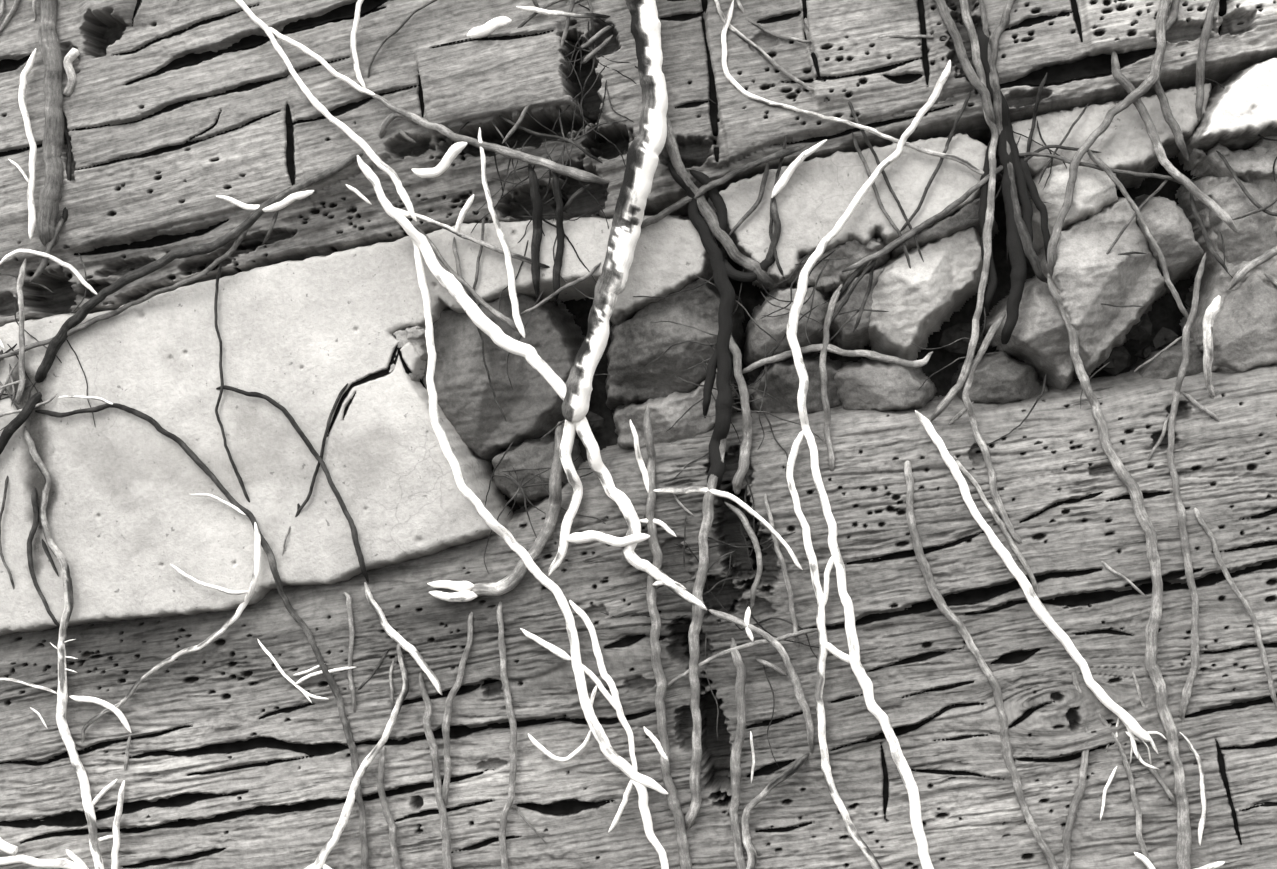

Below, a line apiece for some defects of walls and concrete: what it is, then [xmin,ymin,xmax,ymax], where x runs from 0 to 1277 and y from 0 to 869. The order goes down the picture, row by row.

crack [0,55,31,72]
crack [113,0,386,85]
crack [432,30,554,48]
crack [72,57,420,170]
crack [327,345,427,437]
crack [807,508,1277,636]
crack [0,703,656,868]
crack [402,679,499,705]
crack [745,648,1114,780]
crack [1185,694,1277,718]
crack [1187,643,1277,656]
crack [1218,738,1277,750]